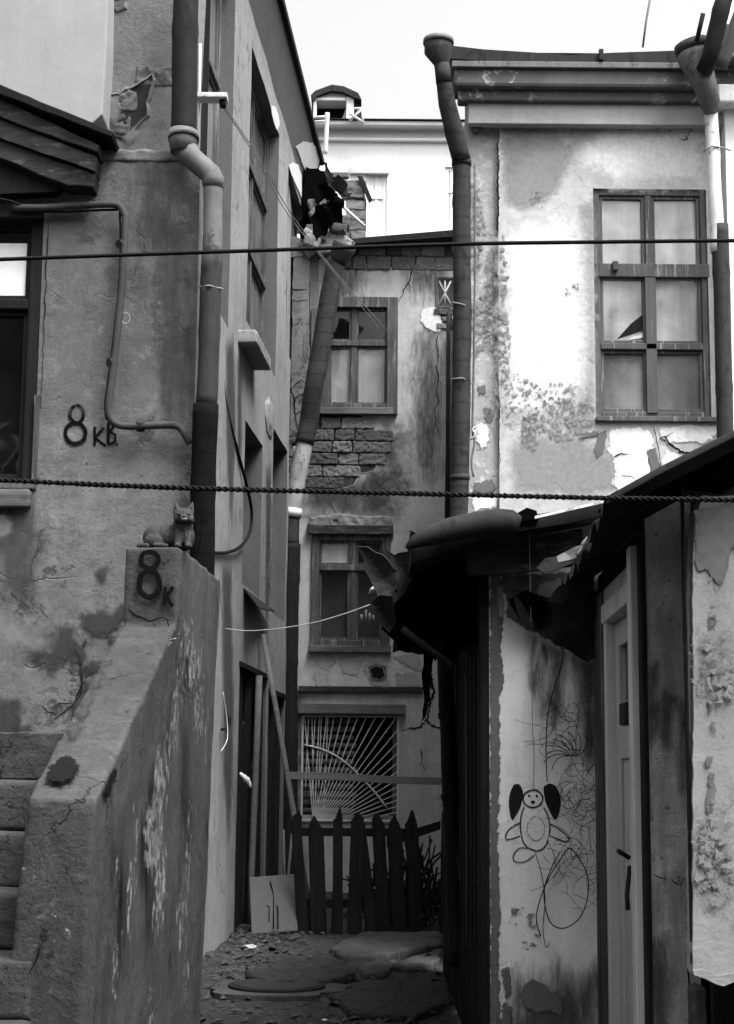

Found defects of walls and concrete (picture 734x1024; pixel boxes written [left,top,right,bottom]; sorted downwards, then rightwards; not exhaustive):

flaking render [109,65,172,141]
leakage [504,128,572,208]
leakage [581,206,594,308]
crack [431,332,443,458]
peeling [470,183,717,490]
peeling [472,479,498,511]
leakage [0,603,124,741]
crack [42,639,87,719]
leakage [531,637,595,761]
peeling [689,502,734,732]
peeling [489,571,568,1024]
peeling [690,756,734,909]